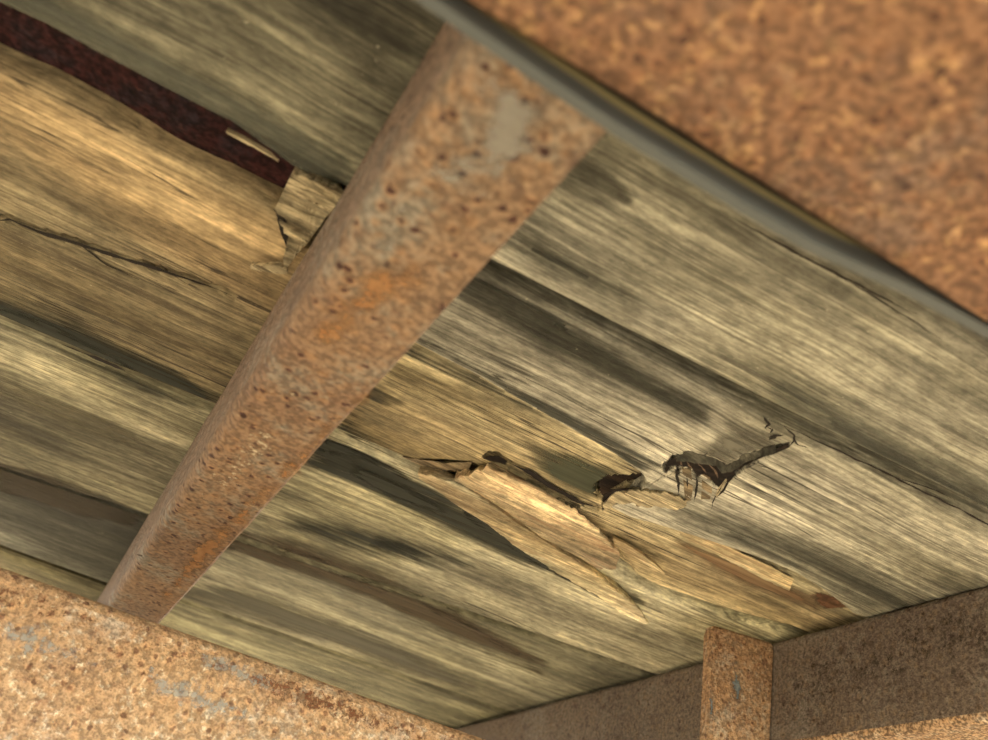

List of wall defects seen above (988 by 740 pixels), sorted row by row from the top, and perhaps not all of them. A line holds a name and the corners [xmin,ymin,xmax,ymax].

corrosion [0,2,295,188]
crack [0,219,232,296]
peeling [250,167,344,274]
peeling [598,445,776,511]
crack [675,467,730,509]
crack [763,416,988,525]
peeling [679,531,793,591]